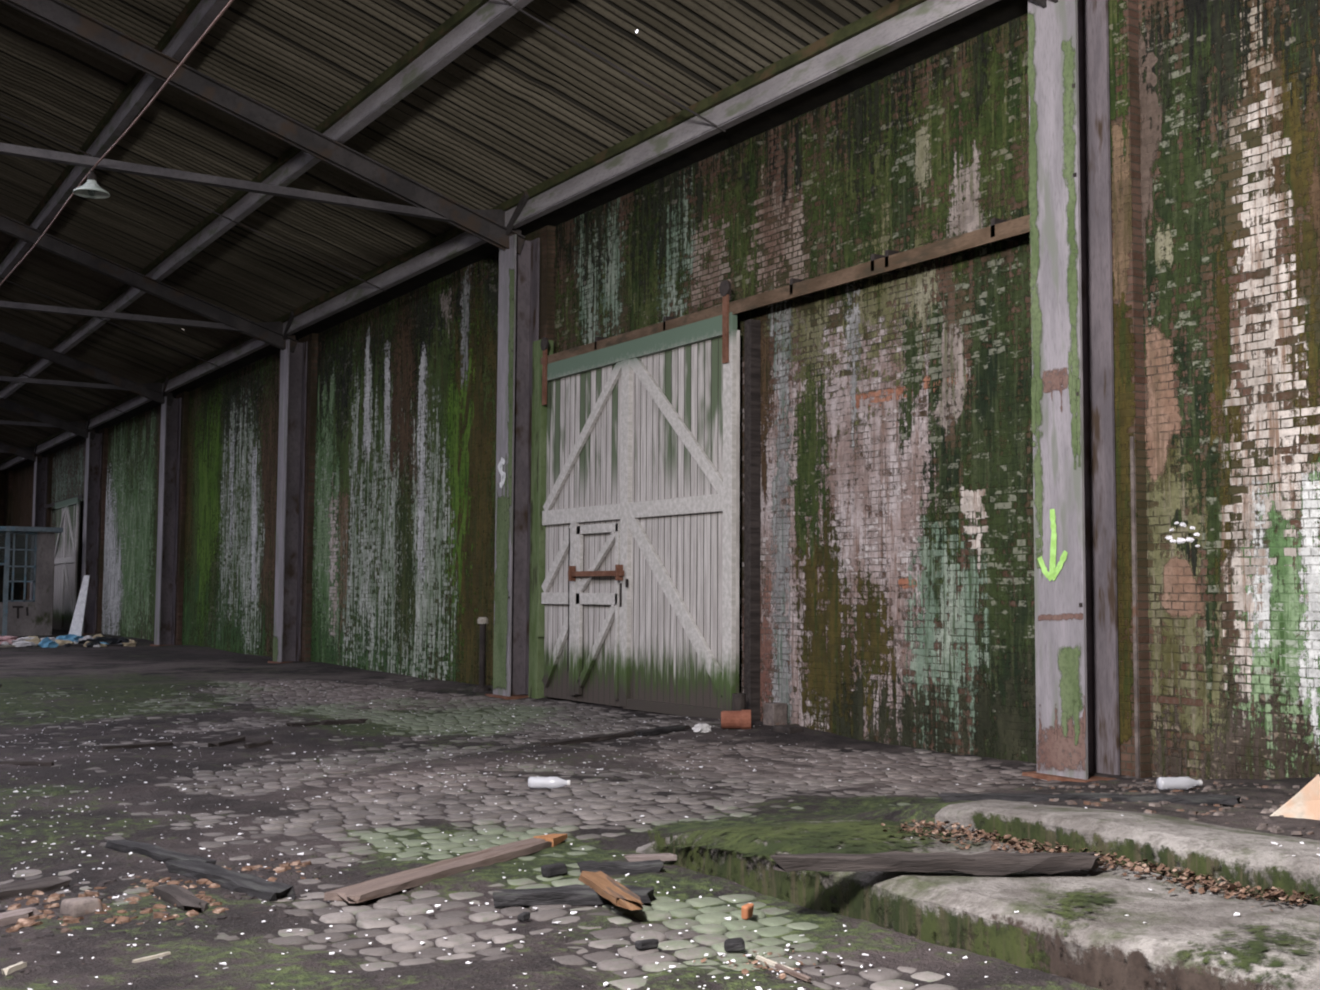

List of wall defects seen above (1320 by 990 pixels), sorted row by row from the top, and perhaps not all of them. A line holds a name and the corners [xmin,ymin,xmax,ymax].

leakage [554,17,1028,345]
spalling [1228,0,1283,194]
efflorescence [101,469,124,636]
leakage [189,357,277,655]
leakage [316,252,499,681]
spalling [850,368,968,410]
peeling [960,486,988,570]
leakage [1139,0,1320,780]